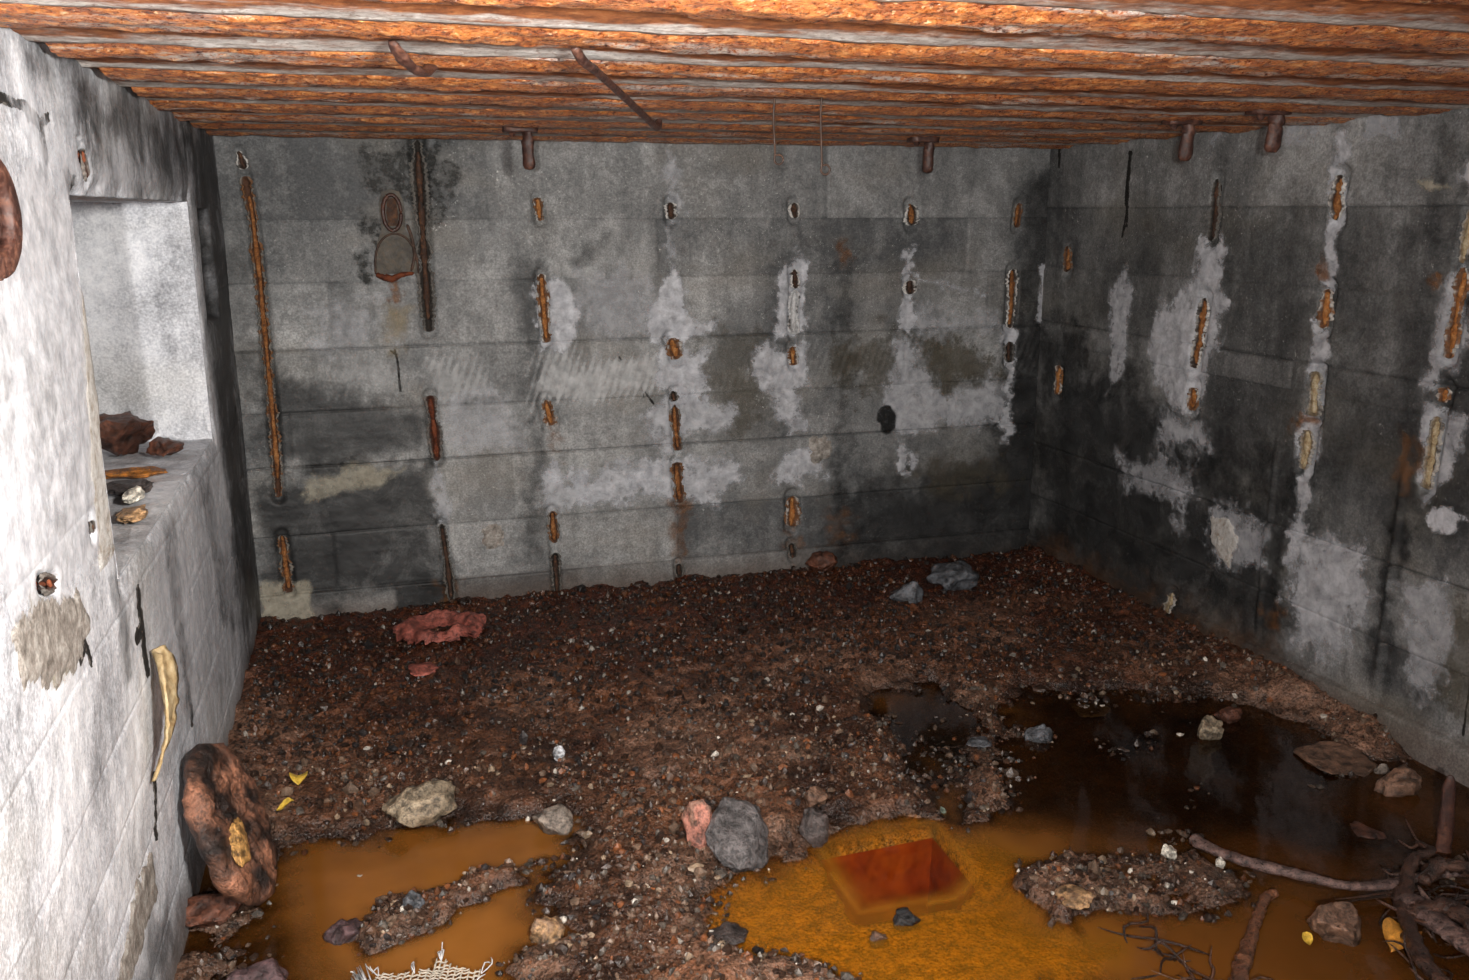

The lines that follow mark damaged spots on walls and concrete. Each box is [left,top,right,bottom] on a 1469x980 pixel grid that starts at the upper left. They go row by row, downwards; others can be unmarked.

spalling [235,151,283,497]
corrosion [376,272,414,302]
spalling [408,140,437,332]
spalling [536,274,552,343]
damp [523,269,740,508]
spalling [665,338,684,360]
spalling [669,391,687,503]
damp [751,259,829,486]
damp [840,177,1469,679]
spalling [1316,289,1335,329]
damp [1320,130,1351,291]
spalling [1443,210,1469,359]